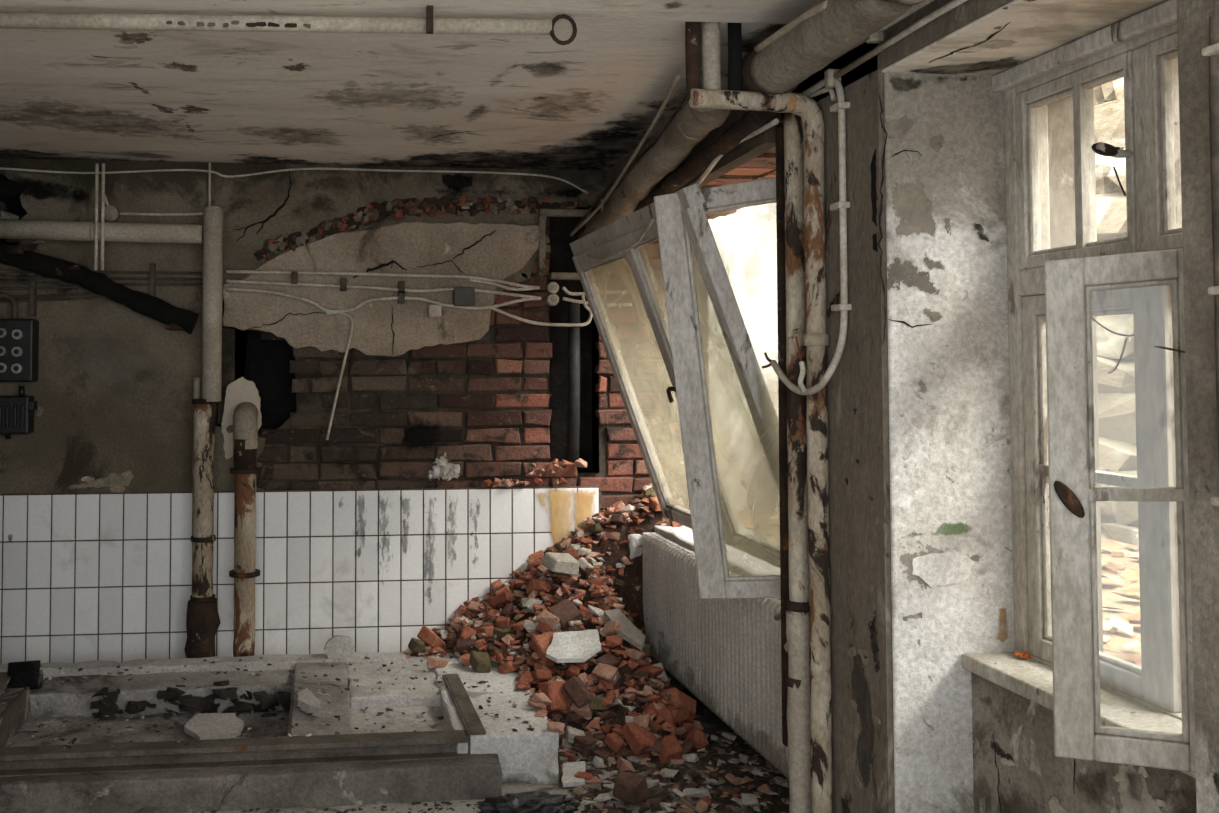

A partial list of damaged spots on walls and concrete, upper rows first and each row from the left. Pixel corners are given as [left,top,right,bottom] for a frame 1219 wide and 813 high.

leakage [514,63,565,74]
leakage [0,105,178,138]
spalling [0,194,27,220]
crack [234,171,292,241]
peeling [870,149,944,322]
flaking render [216,196,709,765]
leakage [356,499,409,557]
leakage [424,512,434,601]
peeling [848,611,881,790]
spalling [612,770,649,805]